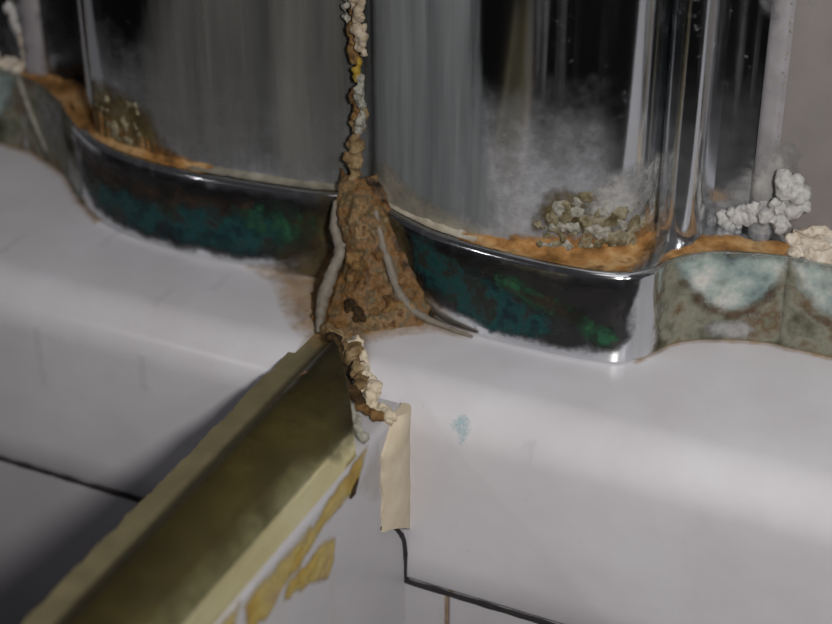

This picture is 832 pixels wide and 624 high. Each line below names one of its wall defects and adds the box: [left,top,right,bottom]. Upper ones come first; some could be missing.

water stain [0,0,20,60]
corrosion [20,69,656,352]
water stain [533,157,660,251]
corrosion [655,234,790,267]
corrosion [62,340,354,624]
peeling [224,450,367,624]